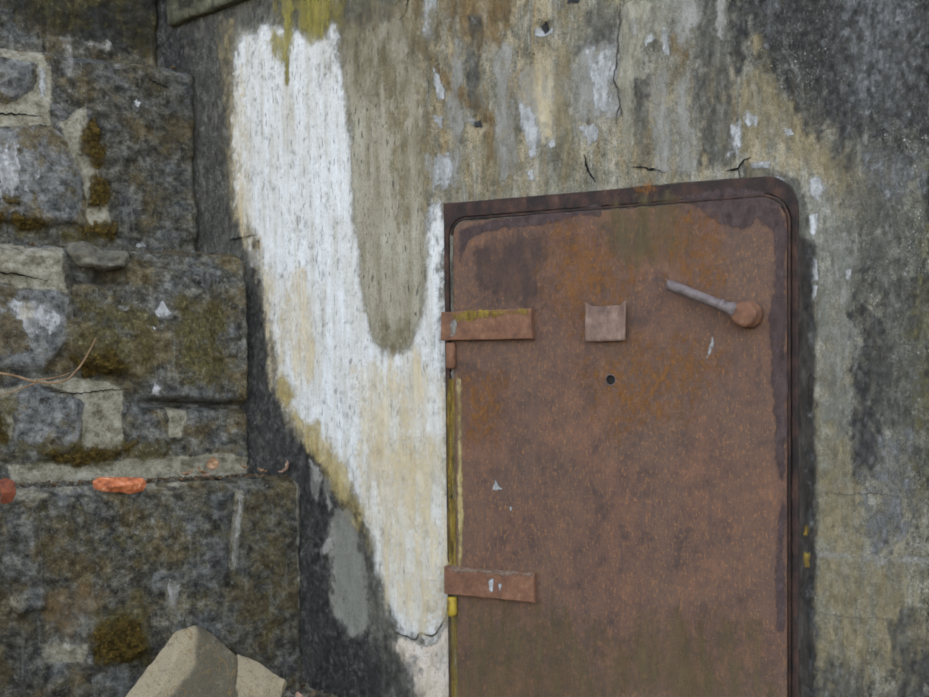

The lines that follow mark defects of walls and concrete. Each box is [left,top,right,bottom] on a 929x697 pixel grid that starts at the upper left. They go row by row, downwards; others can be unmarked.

crack [0,110,43,118]
leakage [483,38,572,186]
spalling [527,149,536,180]
spalling [535,21,553,37]
leakage [587,11,616,47]
crack [613,3,623,125]
peeling [571,0,669,147]
leakage [159,0,482,697]
leakage [634,0,929,697]
crack [396,614,447,644]